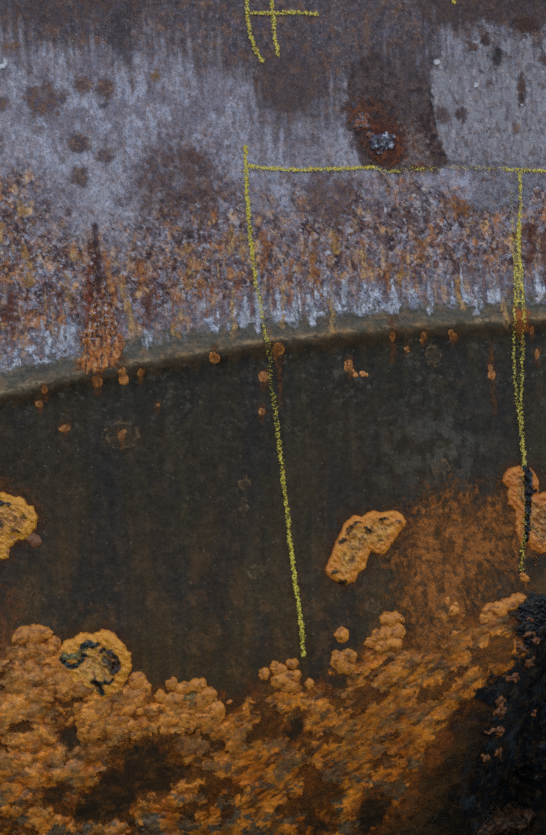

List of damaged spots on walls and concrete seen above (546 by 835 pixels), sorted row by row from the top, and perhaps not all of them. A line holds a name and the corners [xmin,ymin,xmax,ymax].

corrosion [353,112,409,168]
corrosion [72,167,88,187]
corrosion [130,134,218,216]
corrosion [526,221,546,282]
corrosion [2,291,16,334]
leakage [0,316,80,370]
corrosion [77,222,157,375]
leakage [199,279,434,361]
leakage [444,268,507,315]
corrosion [501,298,530,333]
leakage [525,274,546,302]
corrosion [0,484,540,835]